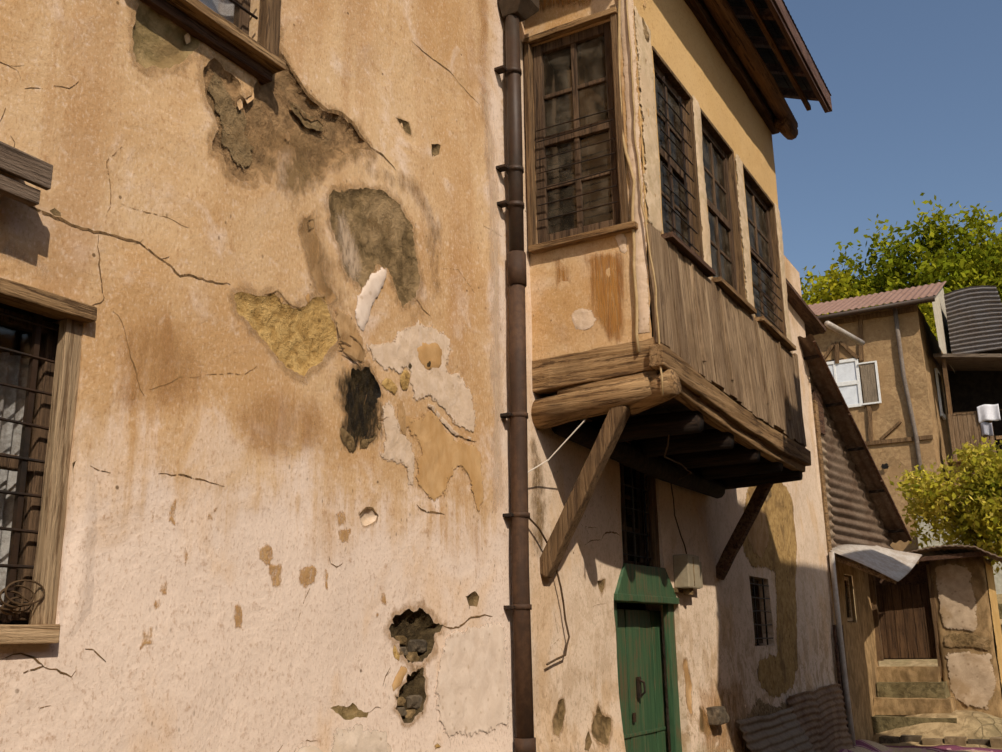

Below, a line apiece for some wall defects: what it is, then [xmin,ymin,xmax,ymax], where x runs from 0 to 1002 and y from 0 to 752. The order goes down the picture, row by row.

spalling [203,37,372,181]
spalling [396,118,411,135]
crack [29,147,257,395]
spalling [234,188,484,520]
peeling [483,92,502,503]
flaking render [743,483,798,718]
flaking render [389,608,510,738]
spalling [553,699,565,736]
spalling [584,706,612,752]